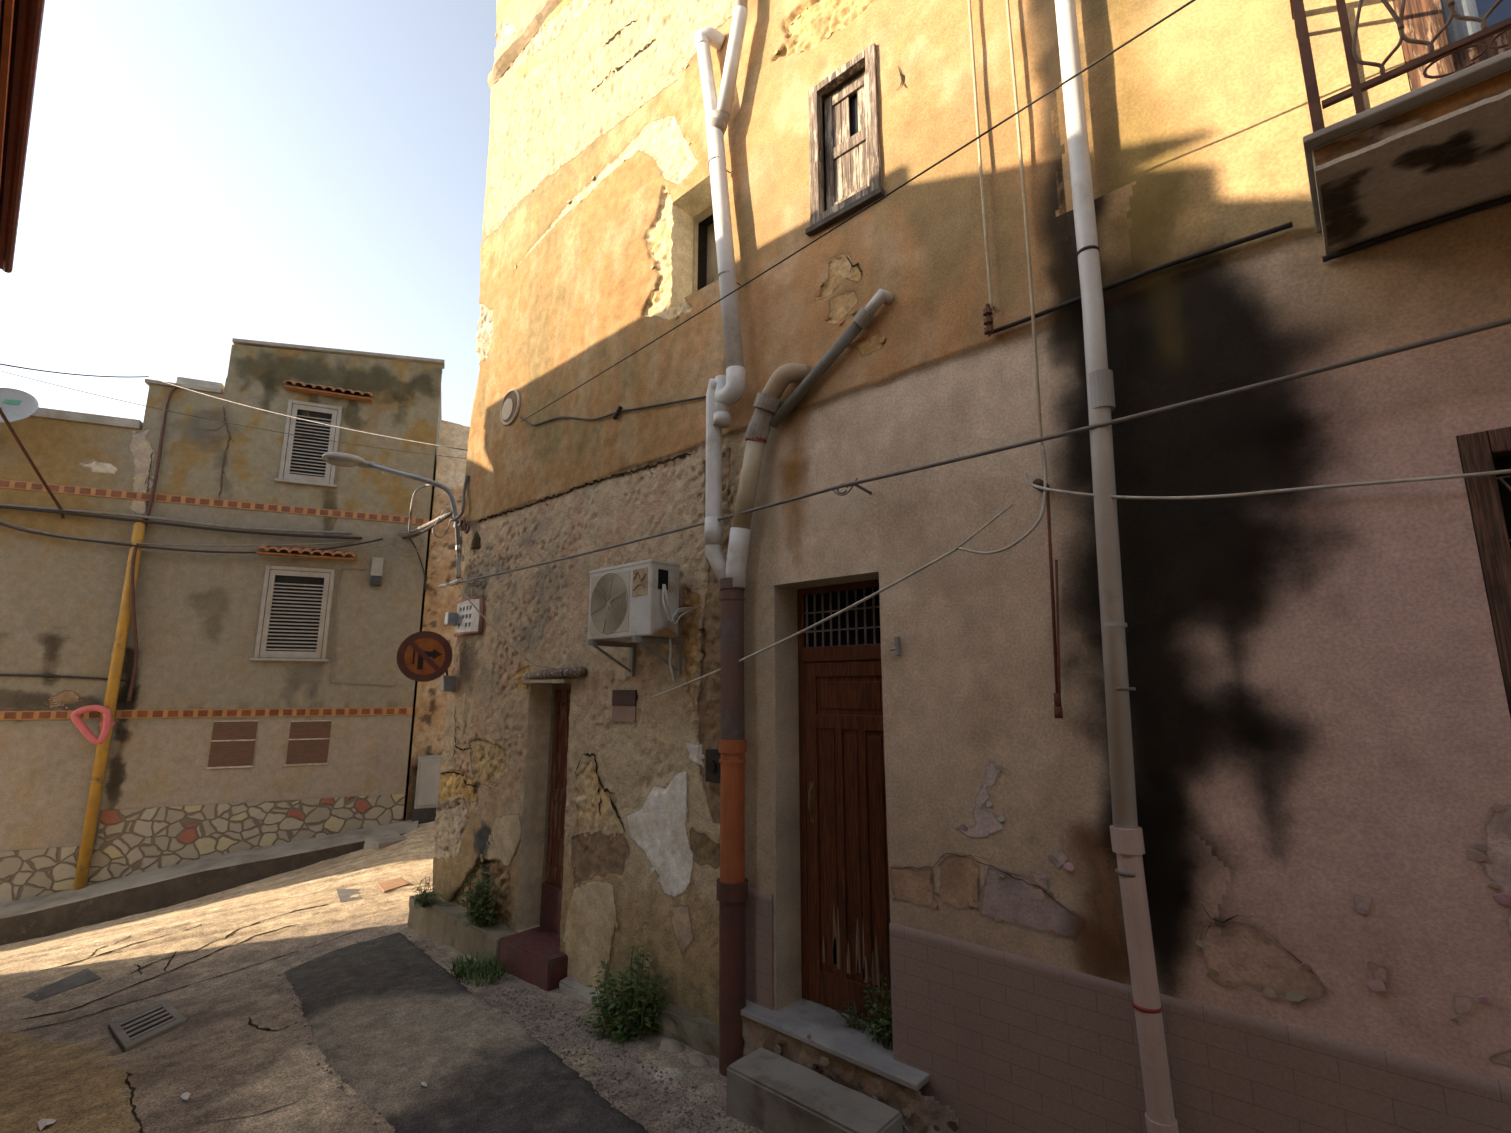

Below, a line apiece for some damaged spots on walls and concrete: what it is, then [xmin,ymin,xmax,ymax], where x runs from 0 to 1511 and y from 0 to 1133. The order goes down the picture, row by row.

flaking render [774,0,874,61]
flaking render [484,0,735,320]
damp [1395,132,1511,173]
damp [1320,171,1368,246]
flaking render [815,253,862,325]
mould [239,355,432,399]
peeling [1466,803,1511,935]
crack [125,1071,144,1133]